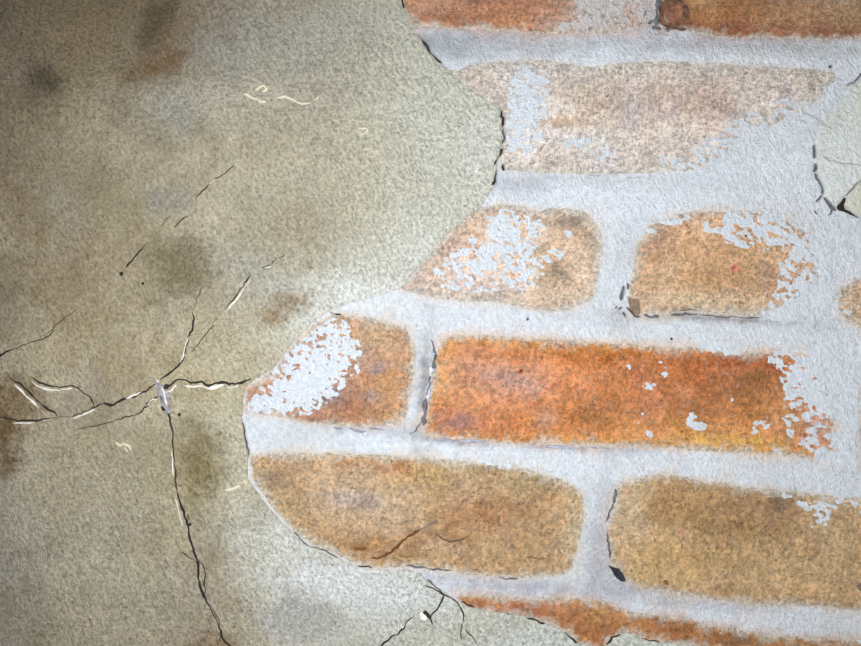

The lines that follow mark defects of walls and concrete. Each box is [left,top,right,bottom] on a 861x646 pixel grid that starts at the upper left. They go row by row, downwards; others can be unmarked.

crack [125,165,234,268]
crack [812,145,861,215]
flaking render [242,0,861,646]
crack [0,255,285,646]
crack [354,520,469,559]
crack [381,579,477,646]